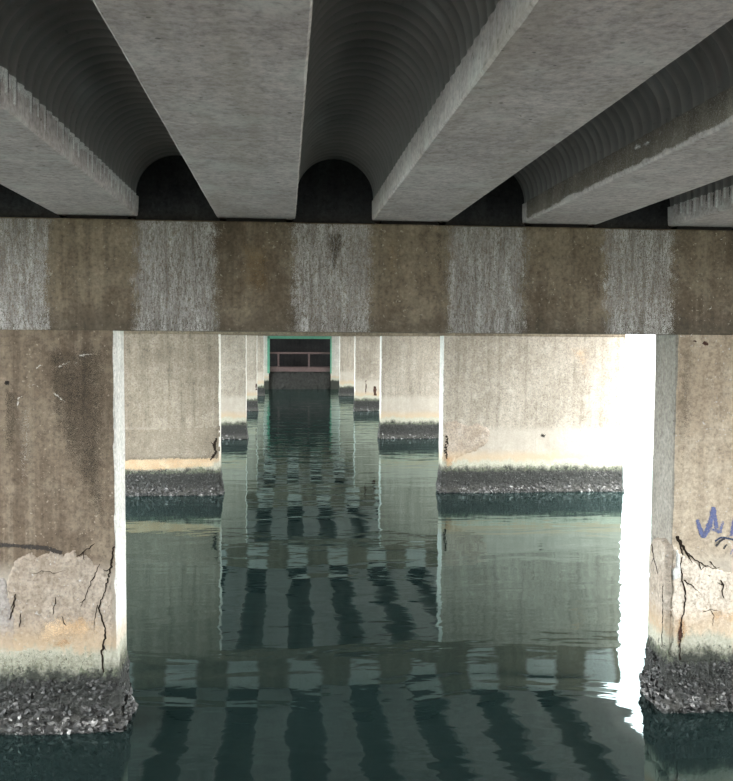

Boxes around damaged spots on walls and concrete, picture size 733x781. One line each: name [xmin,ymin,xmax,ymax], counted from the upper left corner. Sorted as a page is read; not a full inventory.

leakage [434,226,538,333]
leakage [591,229,681,334]
crack [10,594,21,627]
spalling [0,550,114,681]
crack [78,544,115,673]
crack [650,536,724,660]
spalling [669,545,733,662]